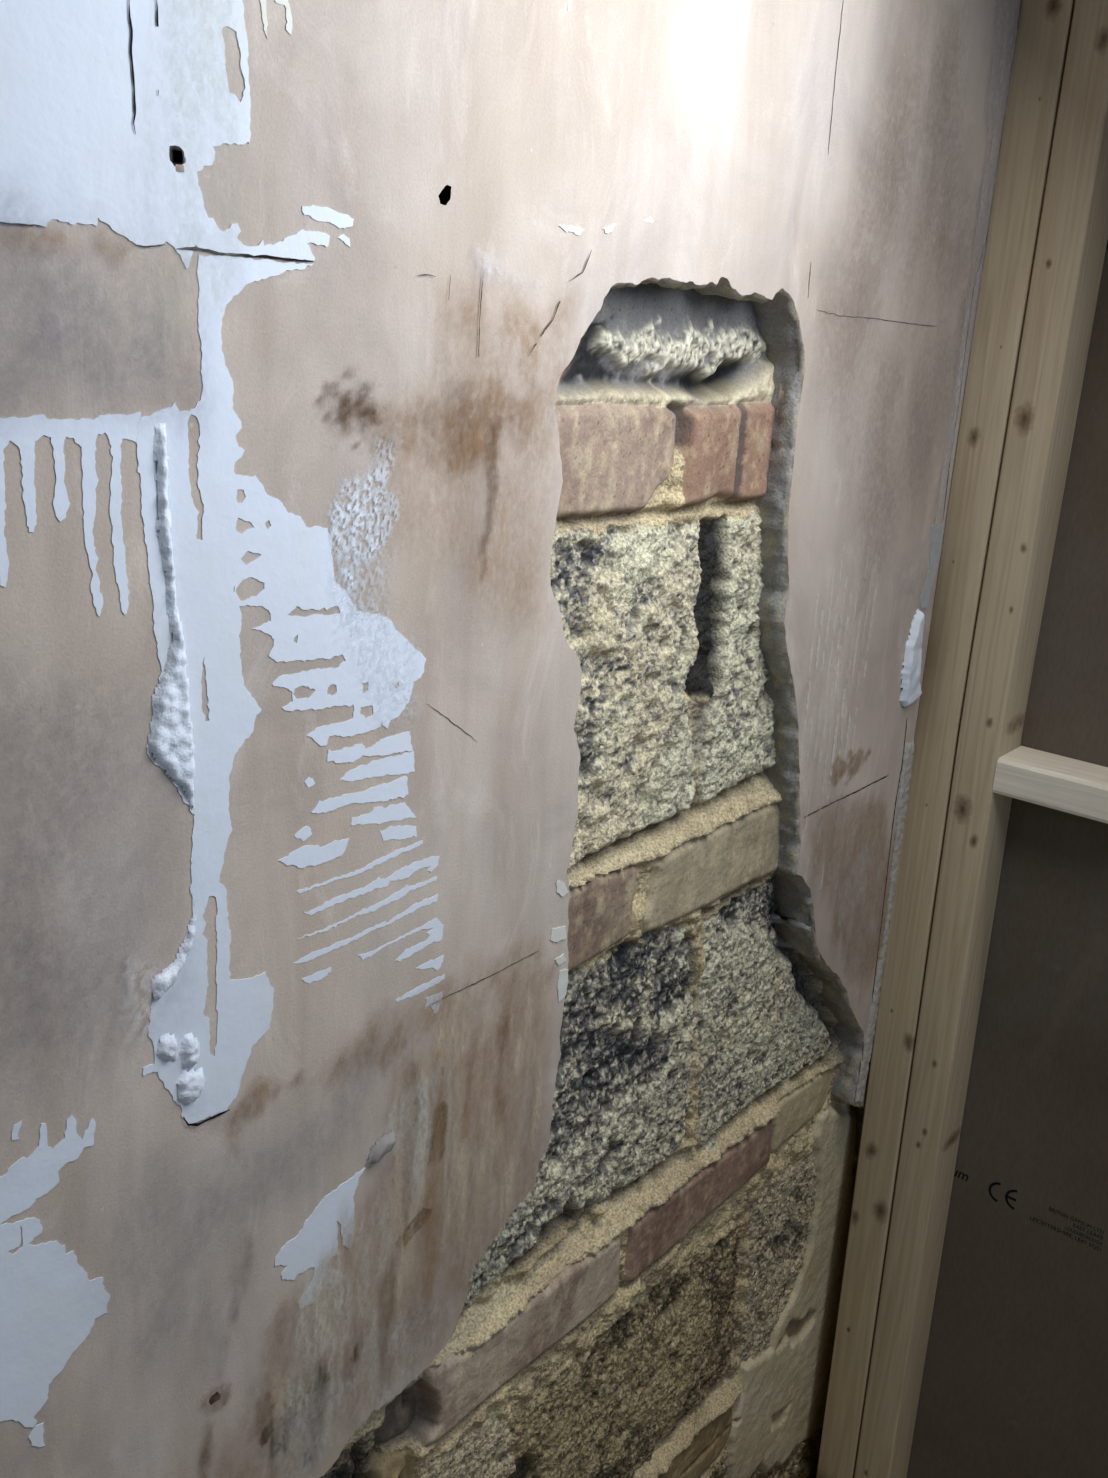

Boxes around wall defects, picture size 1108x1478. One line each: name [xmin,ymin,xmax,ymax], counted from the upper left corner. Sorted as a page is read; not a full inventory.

peeling [0,0,445,1124]
flaking render [320,277,915,1478]
peeling [0,1114,110,1447]
peeling [274,1128,411,1309]
leakage [273,997,542,1471]